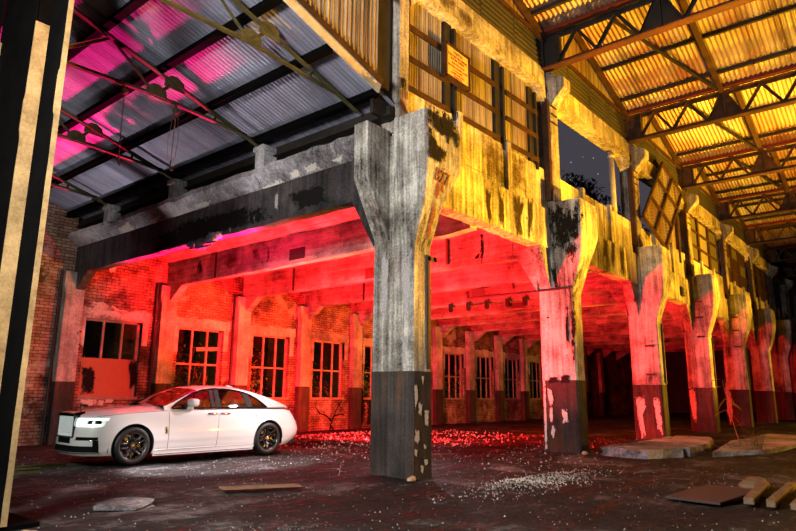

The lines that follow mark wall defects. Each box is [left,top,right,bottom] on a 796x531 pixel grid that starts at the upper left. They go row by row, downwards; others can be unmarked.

damp [425,104,460,162]
damp [483,136,504,180]
damp [512,159,524,185]
damp [475,188,504,263]
damp [514,196,533,238]
peeling [85,300,149,323]
peeling [414,376,429,473]
peeling [543,375,569,450]
peeling [636,396,663,438]